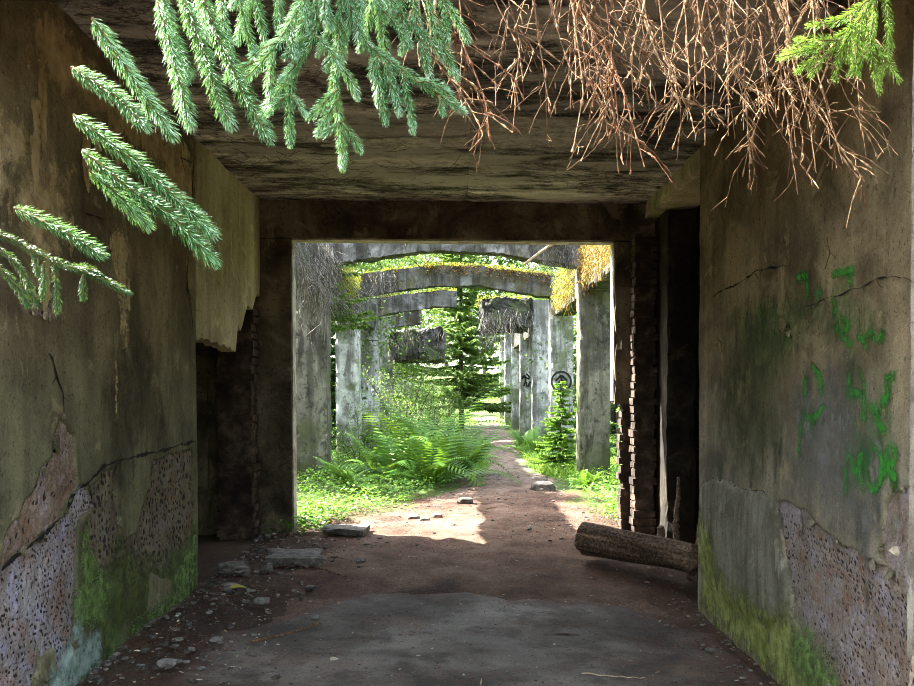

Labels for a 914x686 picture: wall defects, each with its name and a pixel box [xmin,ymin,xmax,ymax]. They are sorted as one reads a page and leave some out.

damp [483,4,597,24]
damp [297,42,473,66]
damp [320,112,647,150]
damp [0,9,195,312]
peeling [26,286,62,322]
damp [110,226,131,414]
crack [713,265,785,297]
crack [807,276,911,307]
crack [49,353,69,404]
spalling [0,420,194,686]
spalling [775,483,914,686]